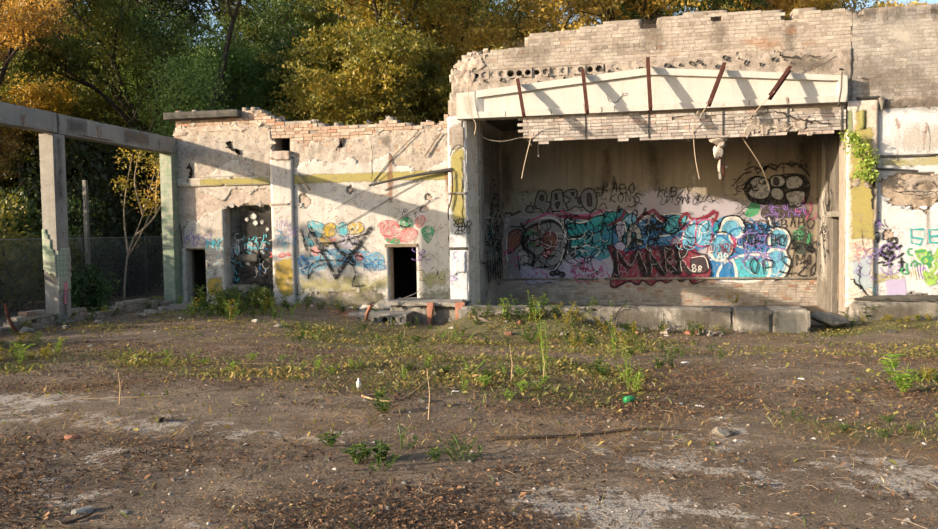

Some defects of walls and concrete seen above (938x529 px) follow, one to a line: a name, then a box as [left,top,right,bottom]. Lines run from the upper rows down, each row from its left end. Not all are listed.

spalling [455,57,486,90]
spalling [741,116,814,138]
peeling [849,172,938,212]